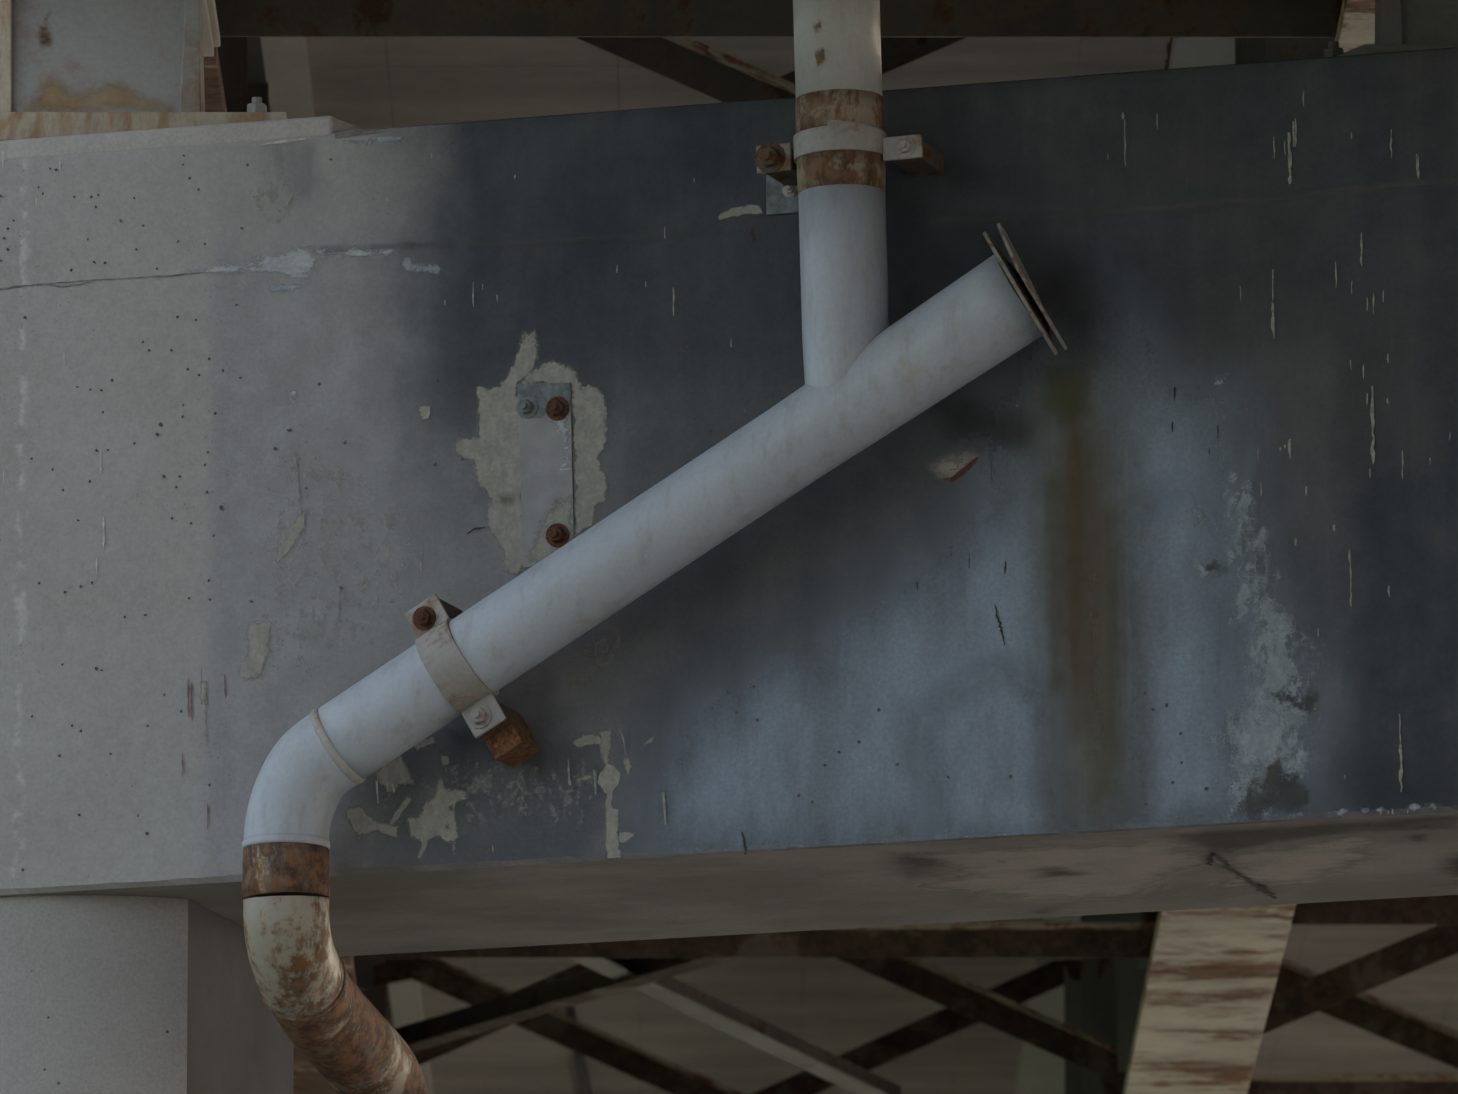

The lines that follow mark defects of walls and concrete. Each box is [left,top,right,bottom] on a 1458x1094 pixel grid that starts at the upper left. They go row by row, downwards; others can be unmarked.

crack [0,272,205,290]
peeling [455,331,608,576]
spalling [935,452,981,482]
water stain [653,300,1320,852]
peeling [346,736,467,858]
peeling [567,728,635,858]